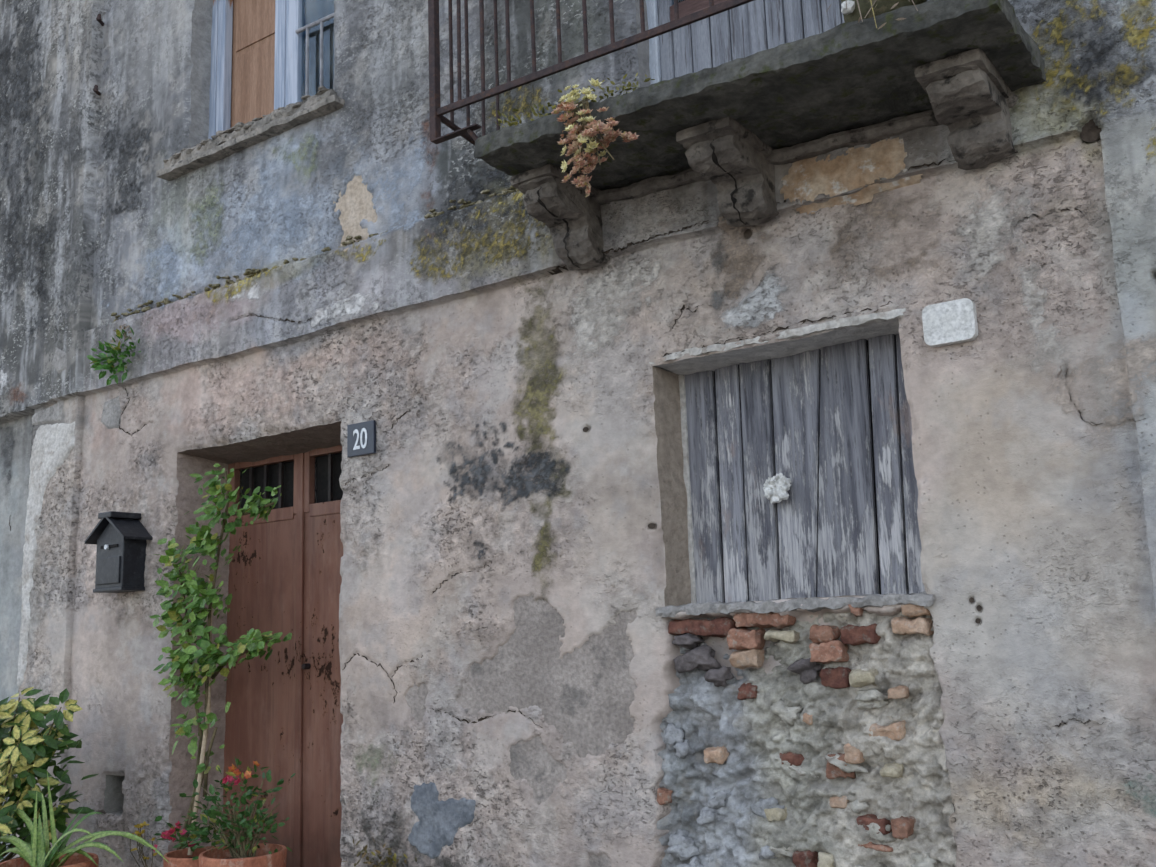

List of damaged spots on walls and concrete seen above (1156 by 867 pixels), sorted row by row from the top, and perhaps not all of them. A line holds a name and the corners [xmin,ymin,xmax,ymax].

mould [1058,34,1152,105]
damp [0,0,54,300]
damp [104,118,151,214]
spalling [333,175,378,252]
damp [435,163,528,234]
spalling [780,137,923,214]
crack [118,385,147,437]
mould [437,422,569,506]
crack [344,653,423,702]
spalling [456,593,637,758]
spalling [509,736,567,805]